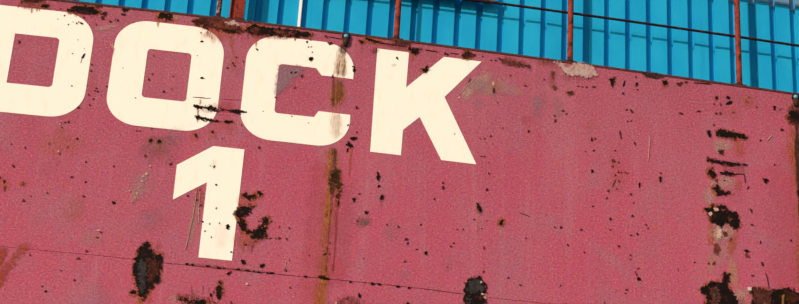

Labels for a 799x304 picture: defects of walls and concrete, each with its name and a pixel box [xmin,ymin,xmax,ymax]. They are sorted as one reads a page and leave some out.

rust [18,0,49,13]
rust [156,10,178,25]
rust [324,35,346,106]
peeling [543,61,625,95]
rust [785,104,799,212]
rust [315,149,344,304]